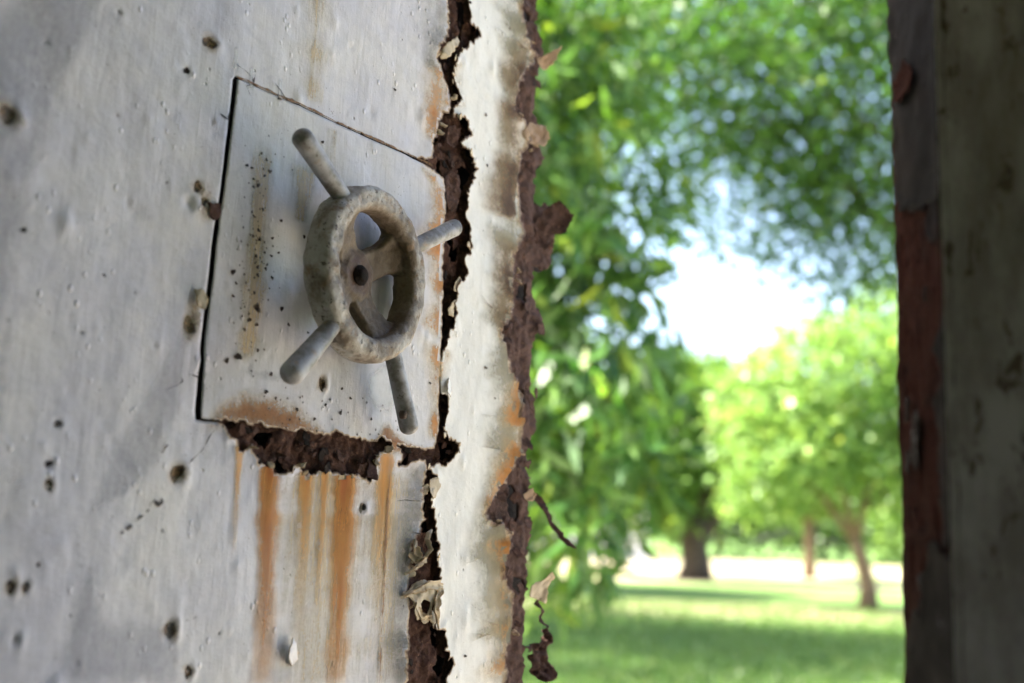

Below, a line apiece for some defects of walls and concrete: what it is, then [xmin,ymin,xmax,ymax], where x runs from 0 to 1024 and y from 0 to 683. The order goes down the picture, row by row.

crack [169,63,432,462]
corrosion [217,387,324,435]
corrosion [235,447,243,506]
spalling [215,419,412,480]
corrosion [259,467,356,671]